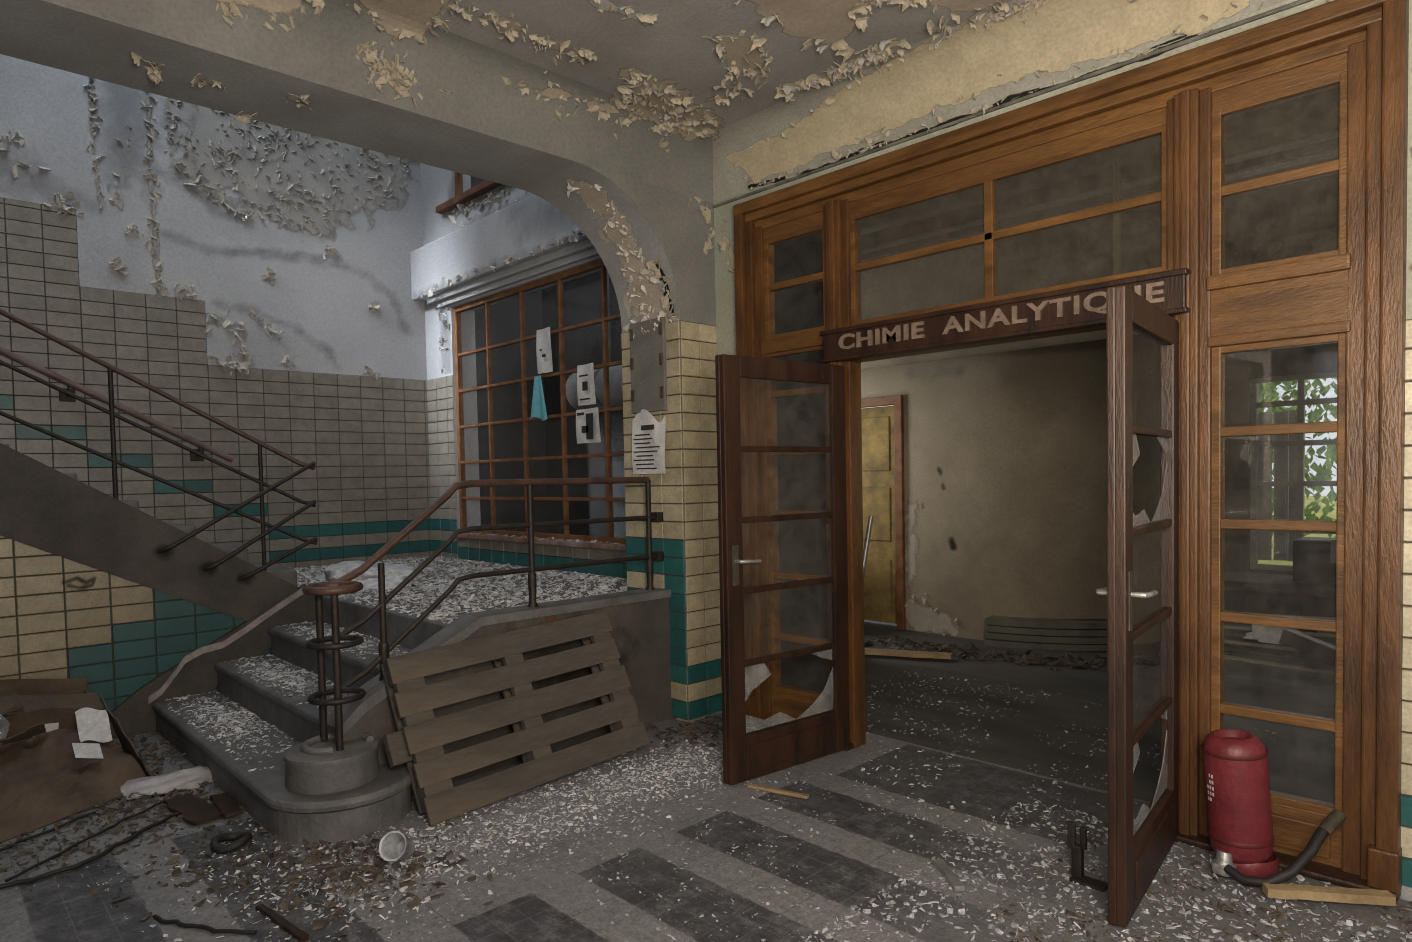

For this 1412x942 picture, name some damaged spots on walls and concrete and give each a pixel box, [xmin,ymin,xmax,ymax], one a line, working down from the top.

peeling [43,52,415,301]
peeling [214,0,325,32]
peeling [346,0,1264,191]
peeling [205,308,283,375]
peeling [419,179,679,373]